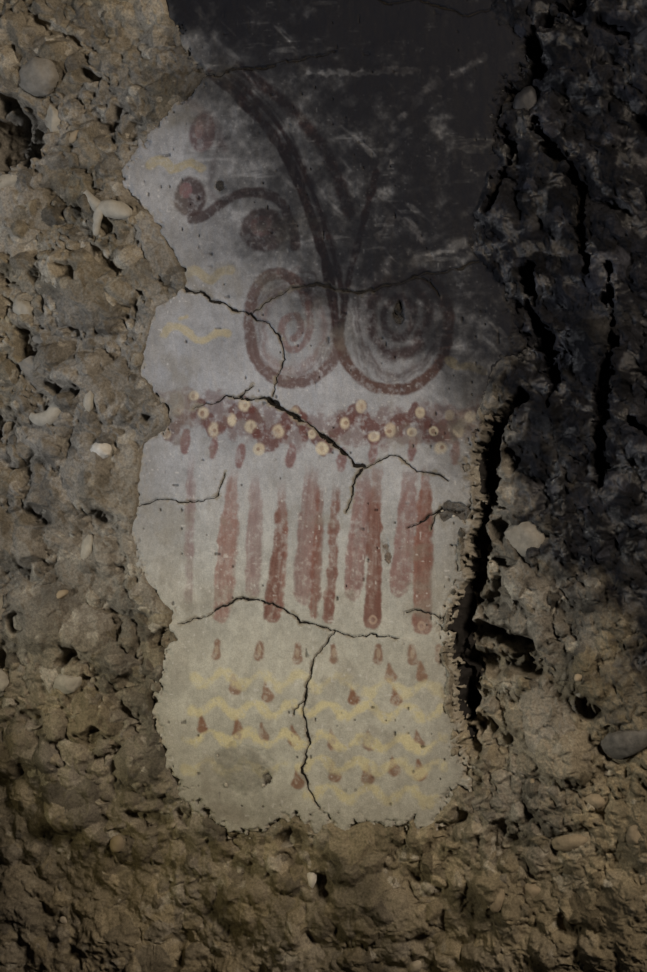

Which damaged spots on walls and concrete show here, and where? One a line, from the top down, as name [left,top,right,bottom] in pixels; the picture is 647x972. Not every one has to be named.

crack [185,261,479,512]
crack [139,474,225,507]
crack [408,505,471,530]
spalling [439,500,471,521]
spalling [161,628,178,648]
crack [179,597,398,807]